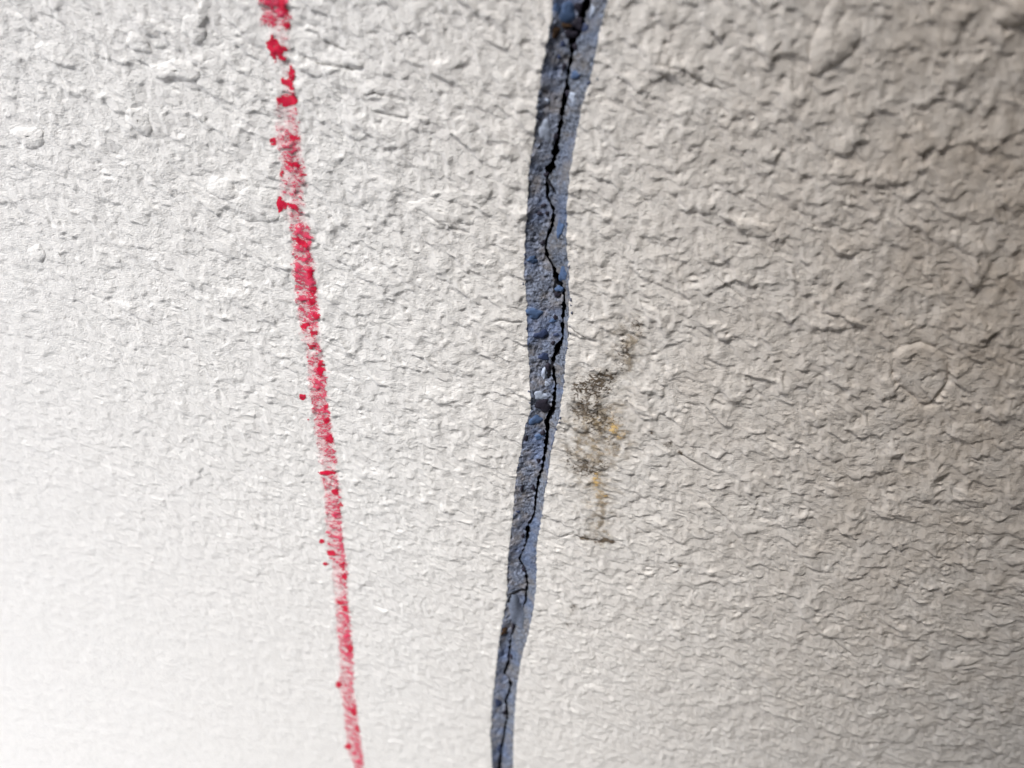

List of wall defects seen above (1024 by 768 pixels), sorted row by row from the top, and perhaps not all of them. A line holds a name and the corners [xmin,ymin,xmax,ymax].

crack [490,0,608,768]
leakage [567,396,628,468]
leakage [580,482,615,544]